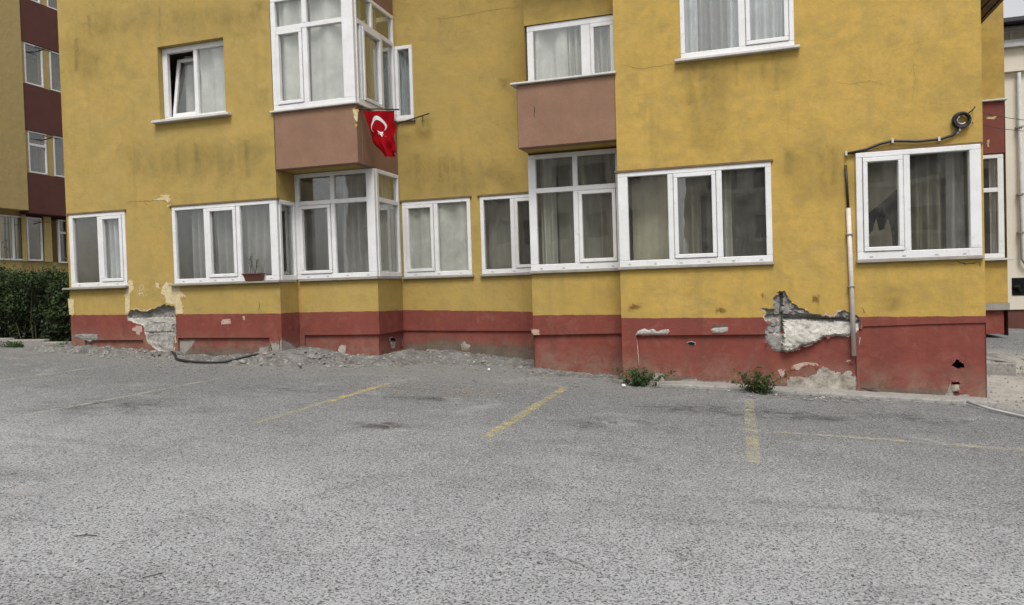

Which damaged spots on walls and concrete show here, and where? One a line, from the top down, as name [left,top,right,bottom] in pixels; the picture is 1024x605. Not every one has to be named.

spalling [124,278,186,352]
spalling [636,328,669,336]
spalling [710,324,728,333]
spalling [760,290,863,390]